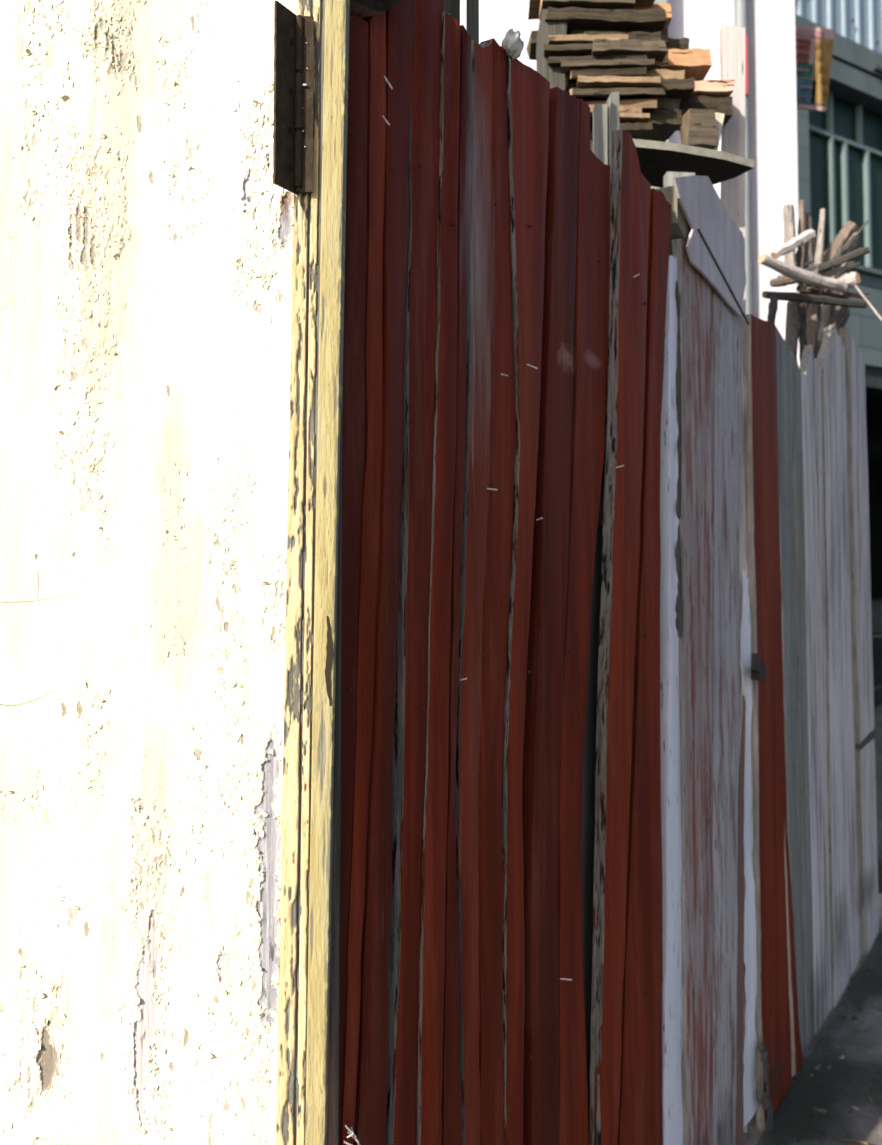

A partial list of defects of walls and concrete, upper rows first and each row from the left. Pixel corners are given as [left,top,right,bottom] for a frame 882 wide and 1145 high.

peeling [227,79,293,323]
peeling [254,546,287,657]
peeling [118,609,284,1145]
peeling [0,948,76,1132]